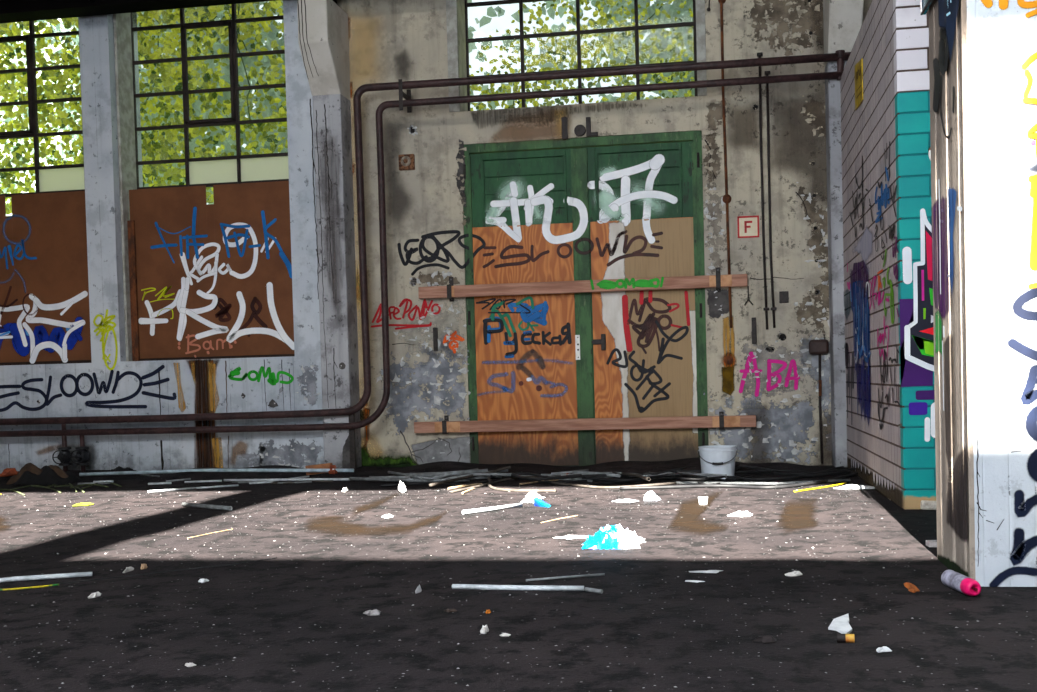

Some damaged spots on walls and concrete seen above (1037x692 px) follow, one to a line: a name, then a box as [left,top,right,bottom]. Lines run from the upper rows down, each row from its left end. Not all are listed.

peeling [741,0,823,56]
damp [324,139,342,306]
rust [187,359,247,468]
peeling [371,300,474,435]
peeling [409,270,460,286]
peeling [412,437,470,465]
peeling [703,182,831,465]